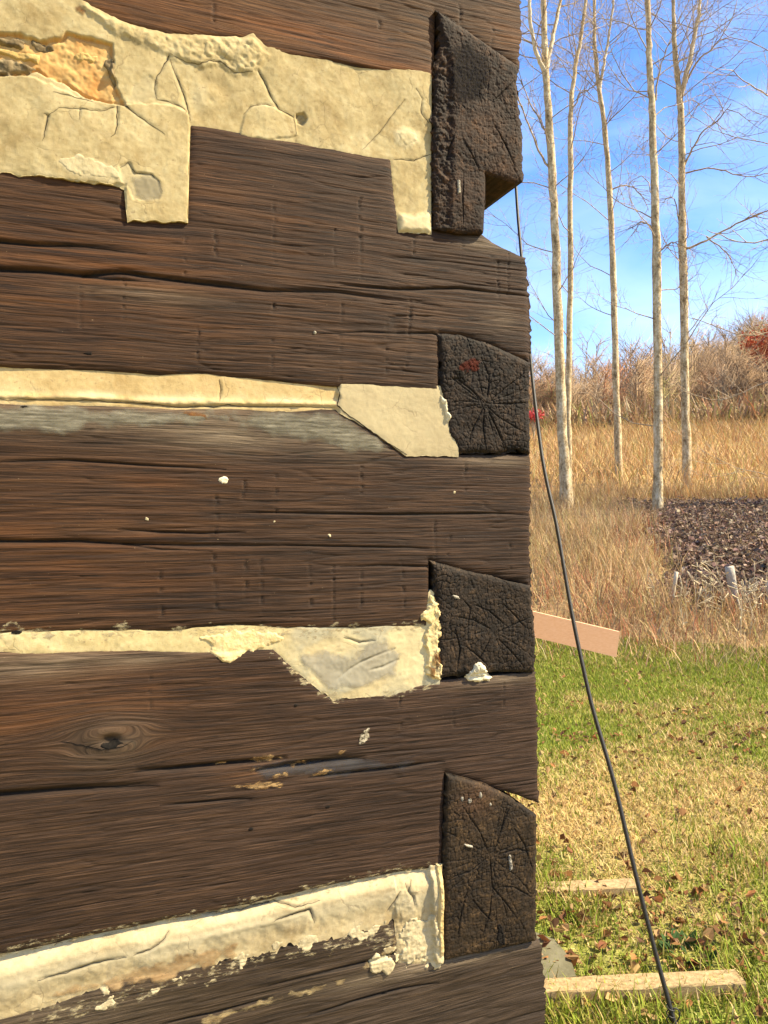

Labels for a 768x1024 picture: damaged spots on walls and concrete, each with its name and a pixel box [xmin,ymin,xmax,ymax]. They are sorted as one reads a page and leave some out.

spalling [0,34,121,105]
crack [43,55,297,139]
damp [0,405,207,432]
damp [250,414,382,450]
peeling [298,935,318,951]
peeling [348,921,386,941]
peeling [231,952,248,969]
peeling [369,946,396,975]
peeling [95,985,116,1010]